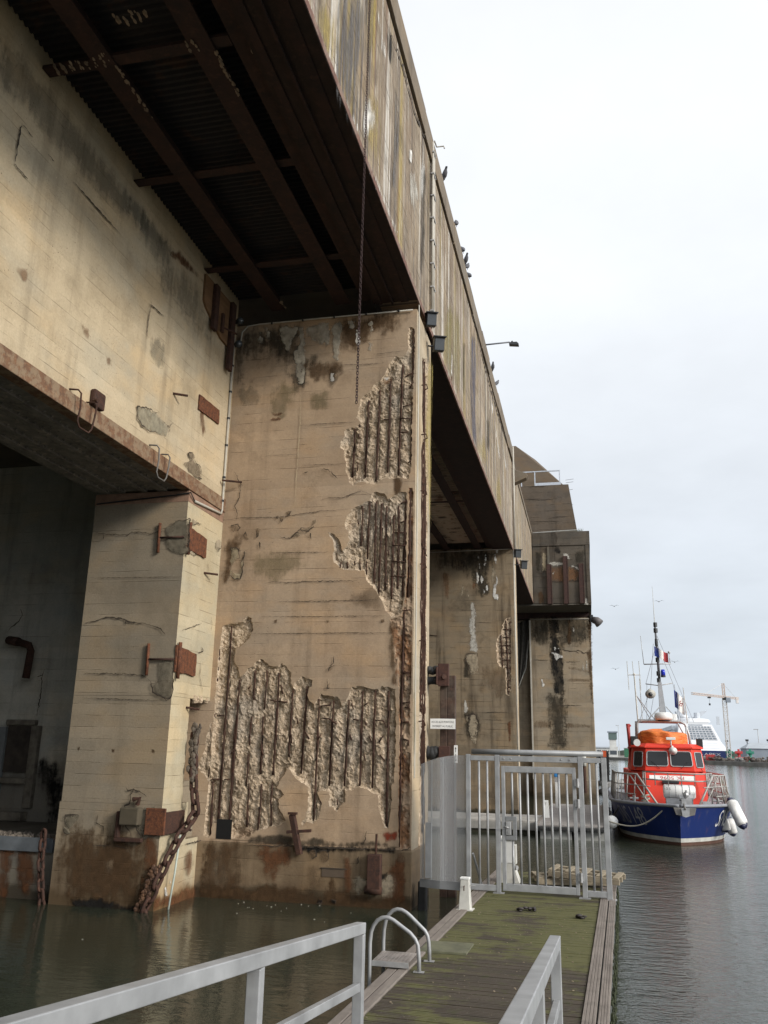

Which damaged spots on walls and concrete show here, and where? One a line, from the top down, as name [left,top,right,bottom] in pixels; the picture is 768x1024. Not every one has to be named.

leakage [235,314,397,388]
spalling [190,326,428,850]
spalling [496,617,512,696]
leakage [532,616,588,748]
rust [57,827,240,912]
rust [382,860,405,901]